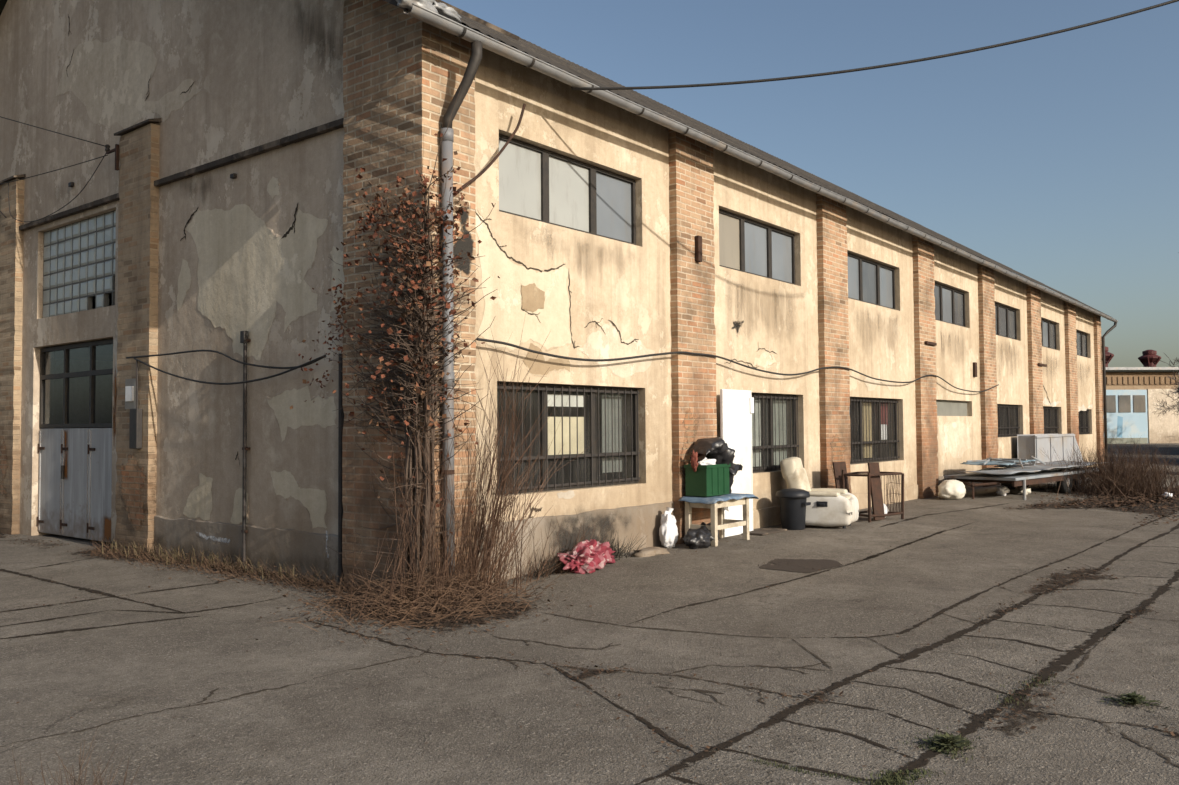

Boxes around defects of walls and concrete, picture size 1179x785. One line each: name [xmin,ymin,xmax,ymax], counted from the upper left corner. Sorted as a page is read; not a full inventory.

crack [180,208,198,241]
peeling [177,204,345,360]
crack [281,203,298,239]
crack [475,210,639,349]
peeling [475,207,655,378]
peeling [265,386,338,443]
peeling [270,470,328,529]
crack [0,503,1179,785]